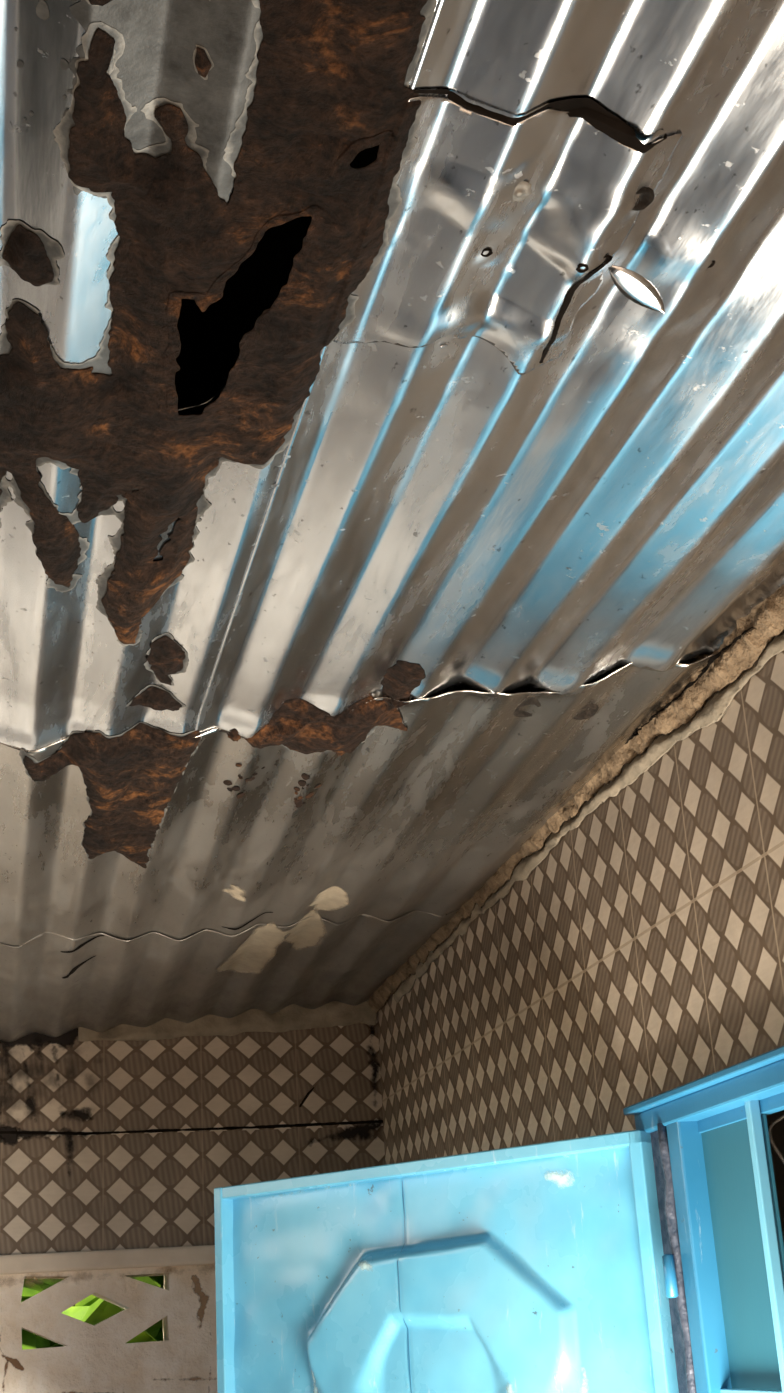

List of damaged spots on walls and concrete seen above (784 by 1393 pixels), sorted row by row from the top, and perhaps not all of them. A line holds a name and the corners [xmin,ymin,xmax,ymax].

corrosion [0,0,437,869]
leakage [3,1038,59,1114]